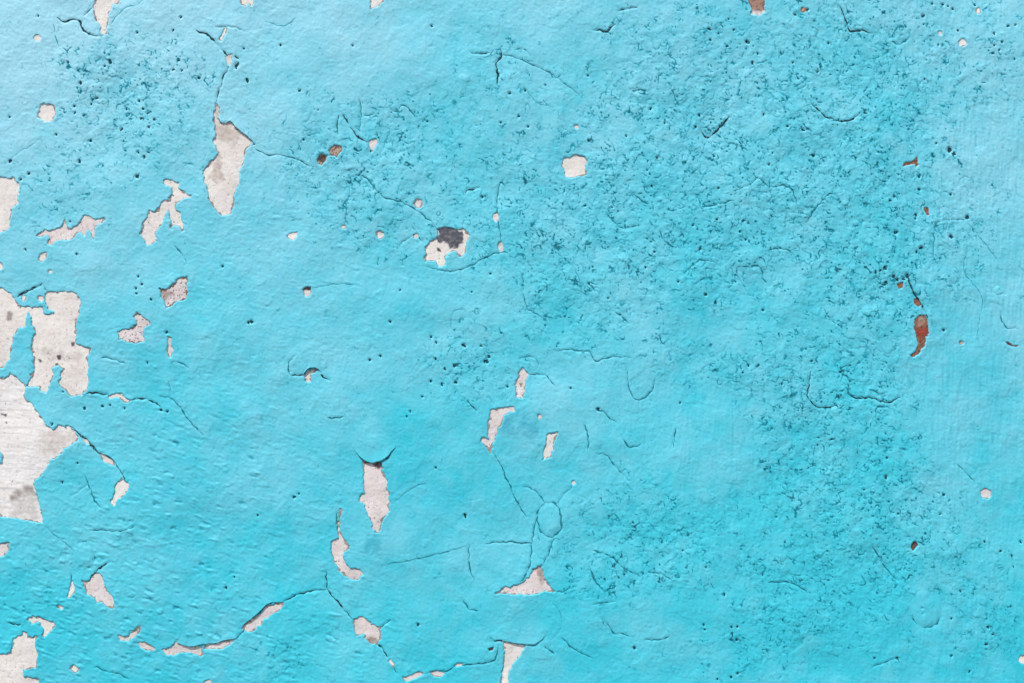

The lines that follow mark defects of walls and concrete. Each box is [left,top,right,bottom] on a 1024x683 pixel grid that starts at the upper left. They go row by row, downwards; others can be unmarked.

peeling [203,104,255,215]
peeling [140,179,192,245]
peeling [413,227,470,266]
rust [911,299,929,357]
peeling [0,288,129,523]
peeling [481,368,528,454]
peeling [354,445,396,533]
crack [387,455,573,585]
peeling [0,616,55,683]
peeling [118,597,284,657]
peeling [495,566,555,595]
crack [426,550,670,674]